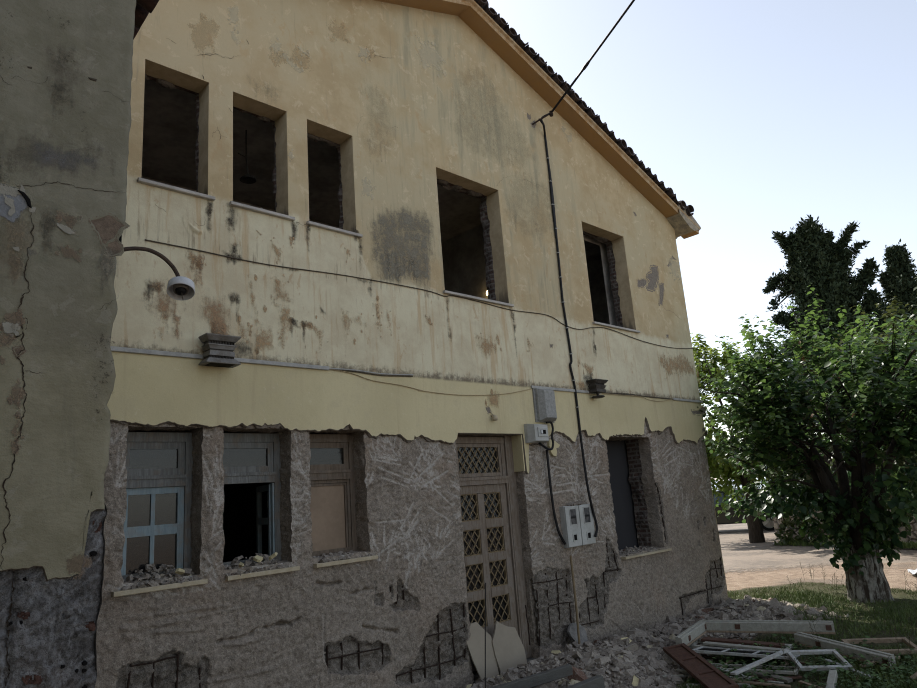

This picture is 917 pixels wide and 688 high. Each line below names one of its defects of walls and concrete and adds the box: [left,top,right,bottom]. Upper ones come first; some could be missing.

peeling [0,183,36,222]
spalling [56,210,130,257]
leakage [373,210,430,281]
spalling [636,255,677,306]
crack [0,212,40,686]
spalling [110,419,544,474]
spalling [374,579,421,612]
spalling [525,538,621,650]
spalling [679,557,725,617]
spalling [116,649,212,688]
spalling [324,636,391,676]
spalling [395,603,469,686]